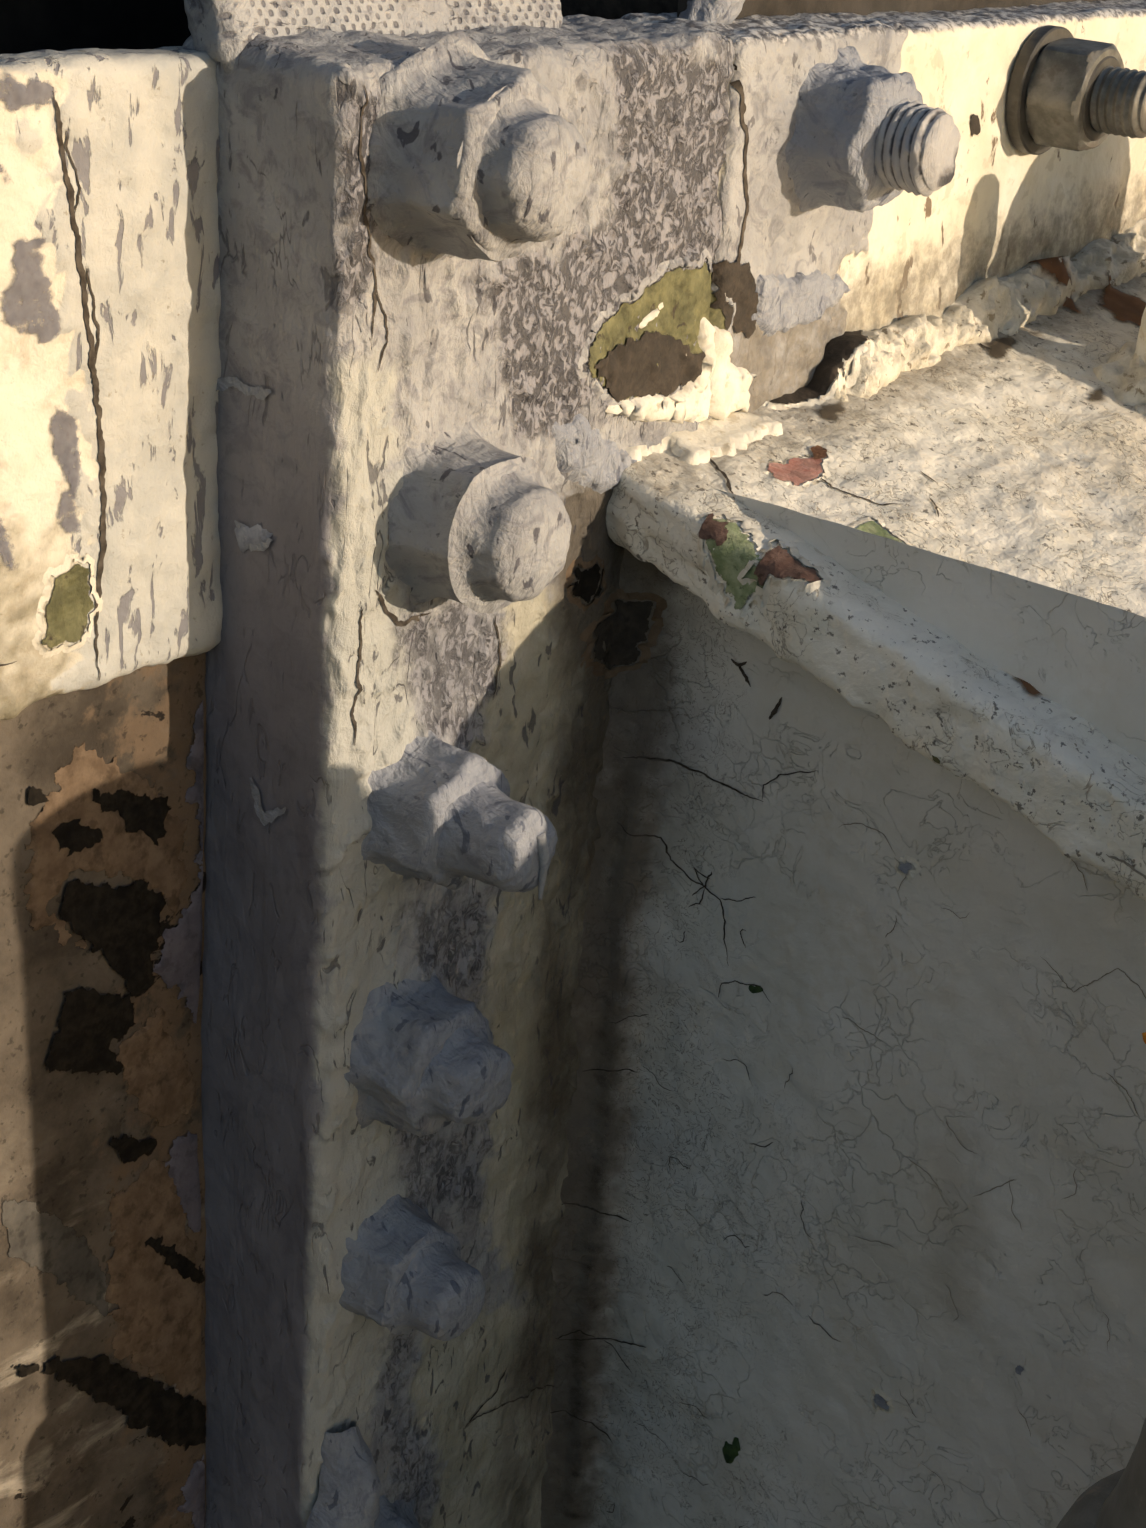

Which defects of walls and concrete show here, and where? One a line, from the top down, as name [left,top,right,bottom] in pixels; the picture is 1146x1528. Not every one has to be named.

crack [53,87,107,680]
peeling [578,248,875,491]
peeling [32,553,103,658]
crack [731,659,782,720]
peeling [52,788,171,857]
crack [623,756,815,802]
crack [617,822,768,999]
crack [1071,854,1146,891]
peeling [45,879,167,1075]
crack [1040,956,1146,998]
peeling [144,1236,205,1284]
peeling [13,1354,206,1451]